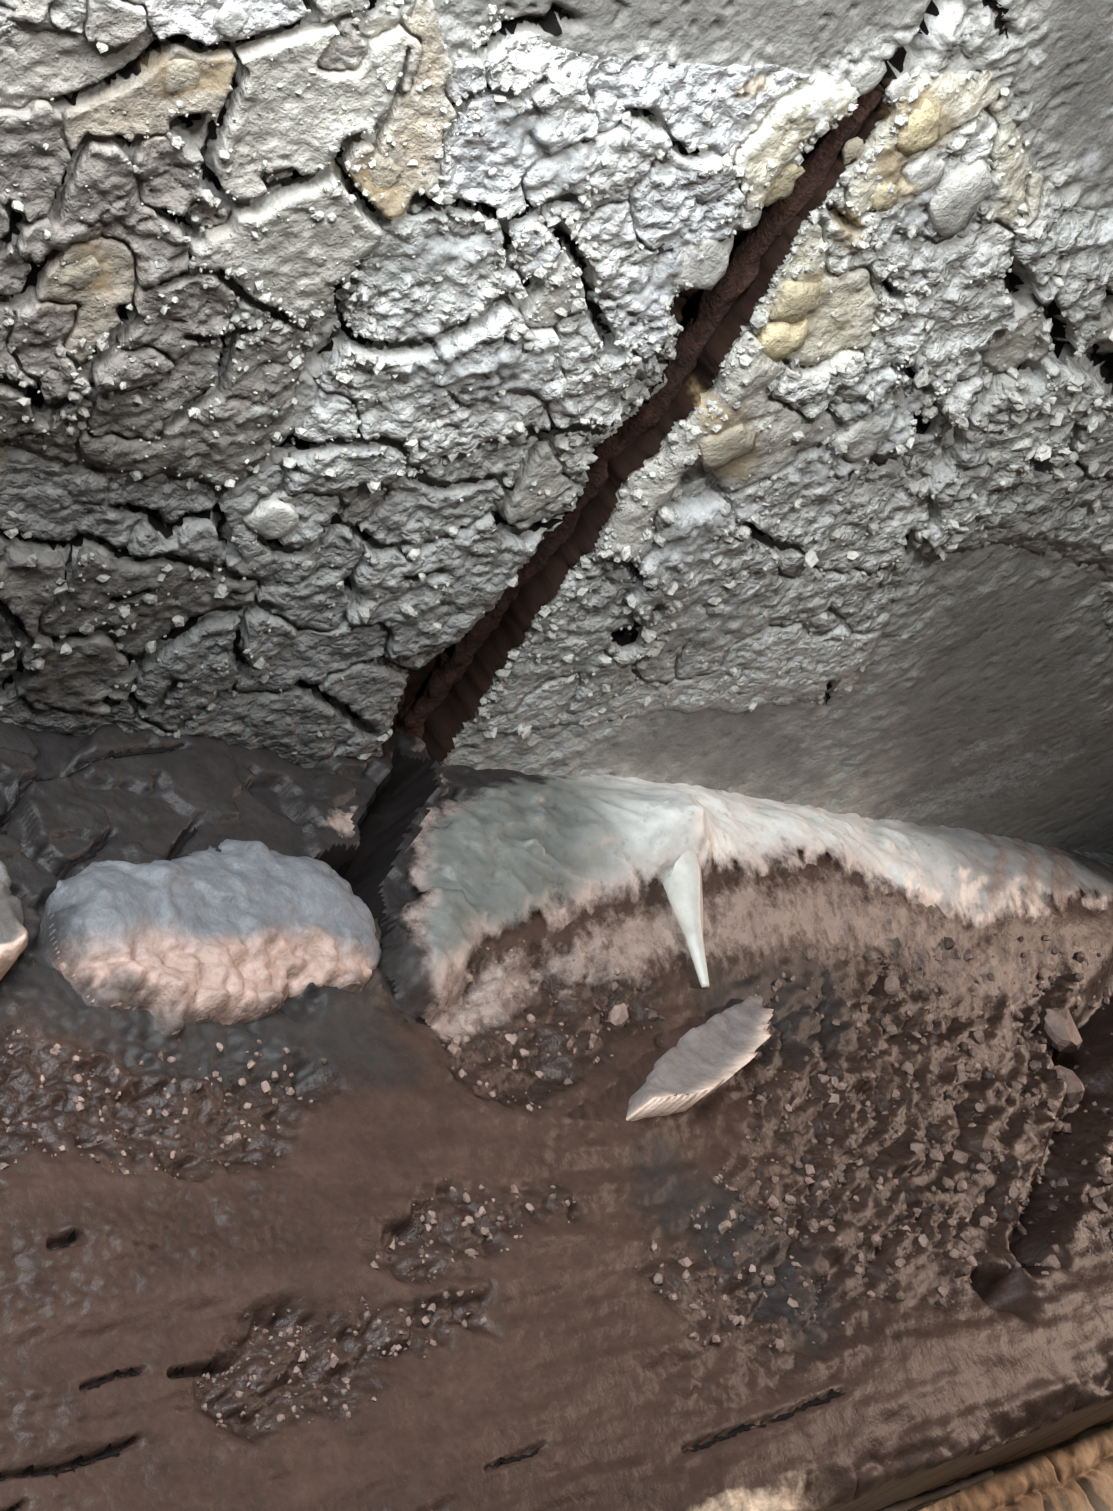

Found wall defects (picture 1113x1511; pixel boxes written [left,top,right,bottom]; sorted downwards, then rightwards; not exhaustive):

crack [983,0,1009,38]
crack [0,502,229,581]
crack [0,0,304,298]
crack [161,208,388,354]
crack [275,433,317,450]
crack [262,147,385,215]
peeling [0,0,1113,764]
crack [297,0,939,1027]
crack [1005,262,1113,390]
damp [17,774,1113,1084]
spalling [634,933,1113,1353]
damp [638,1146,839,1349]